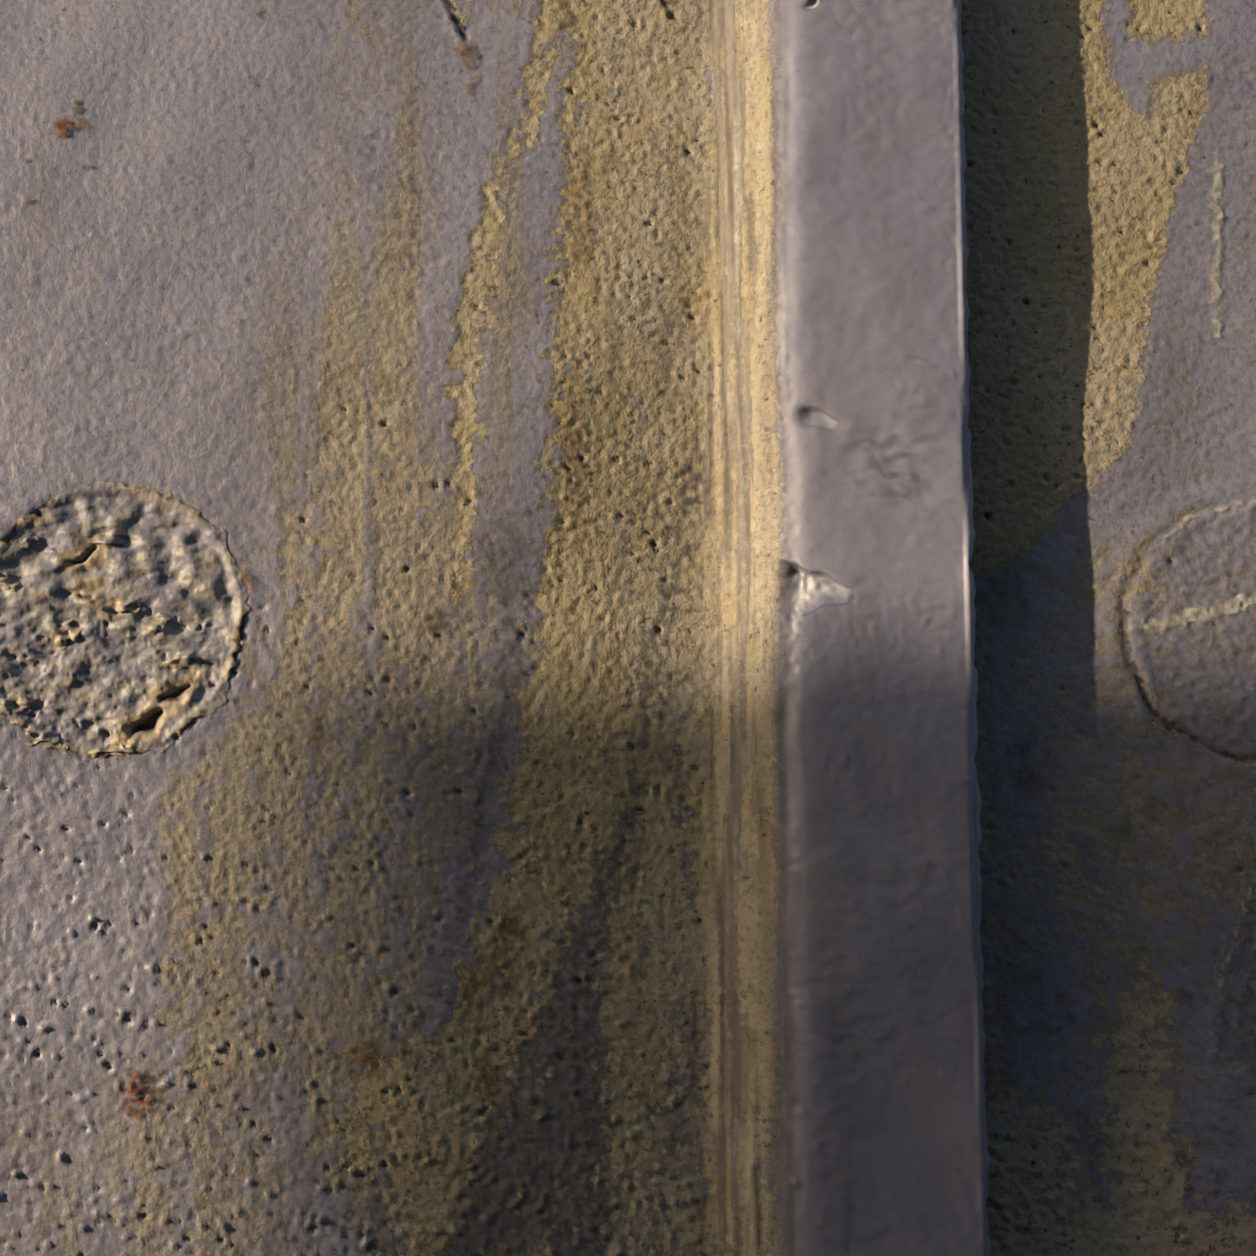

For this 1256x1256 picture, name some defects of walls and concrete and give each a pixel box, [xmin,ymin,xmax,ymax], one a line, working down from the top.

crack [445,0,467,40]
peeling [961,0,1213,580]
peeling [0,0,853,1256]